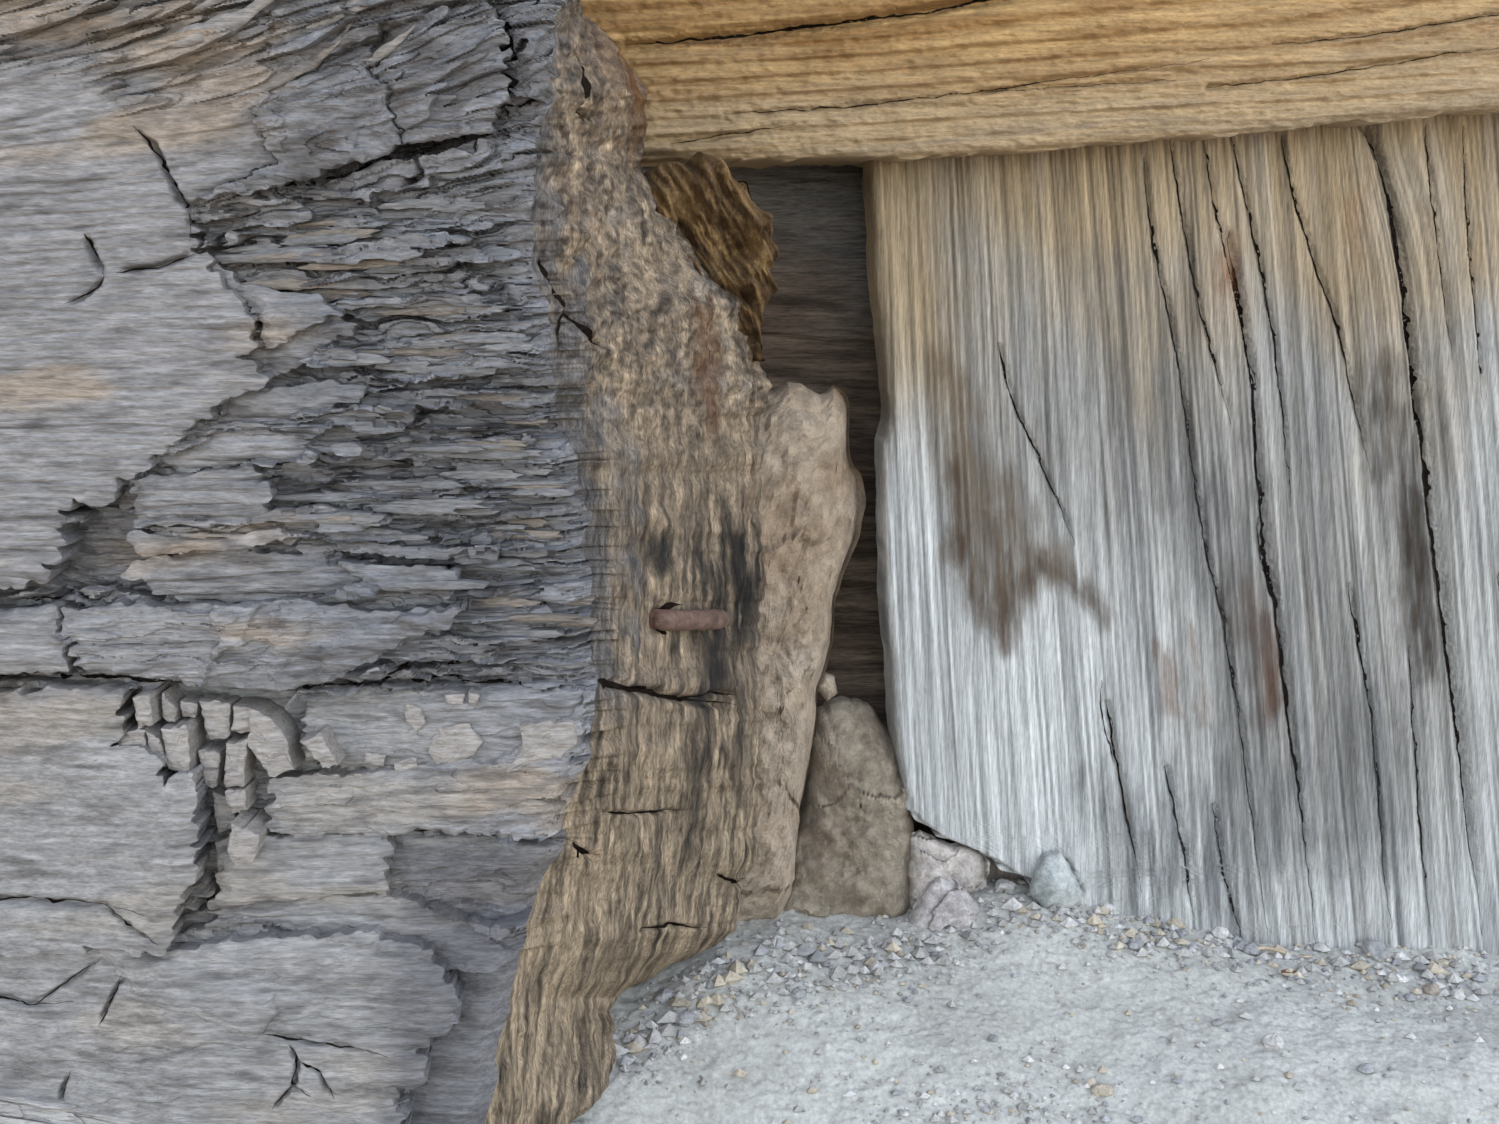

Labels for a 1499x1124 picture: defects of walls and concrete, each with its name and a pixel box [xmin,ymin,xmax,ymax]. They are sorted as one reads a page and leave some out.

peeling [154,0,274,48]
peeling [366,25,416,63]
crack [671,14,1499,144]
crack [1282,146,1372,479]
peeling [214,196,598,638]
crack [1144,137,1316,943]
crack [1360,124,1484,934]
spalling [118,680,346,891]
spalling [364,687,484,772]
crack [302,660,736,705]
spalling [507,717,578,773]
crack [1100,686,1142,893]